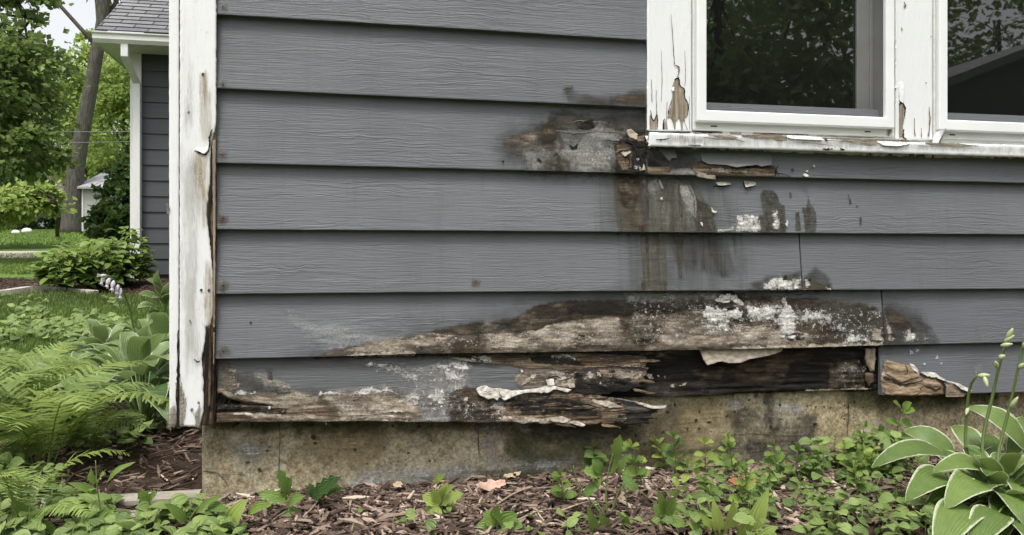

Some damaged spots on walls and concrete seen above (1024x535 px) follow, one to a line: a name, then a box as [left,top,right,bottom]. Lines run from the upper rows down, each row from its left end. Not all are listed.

peeling [621,129,638,157]
peeling [649,77,979,227]
water stain [315,90,929,487]
peeling [715,291,746,310]
peeling [700,333,806,365]
peeling [476,368,615,401]
peeling [910,349,972,397]
peeling [313,386,423,428]